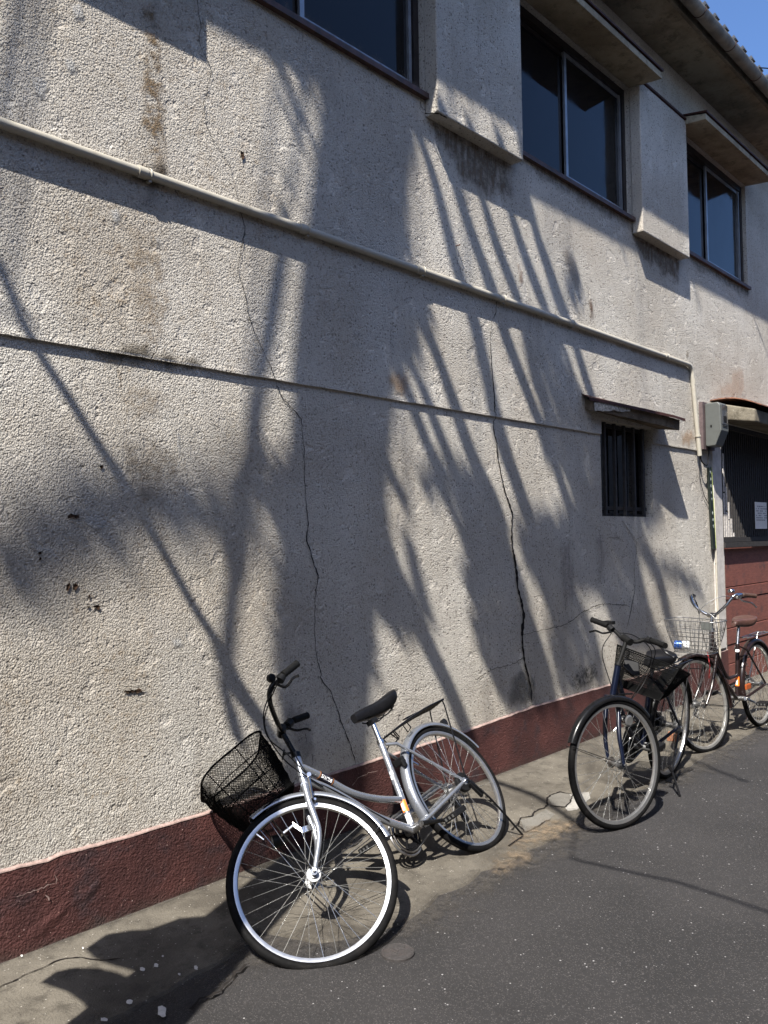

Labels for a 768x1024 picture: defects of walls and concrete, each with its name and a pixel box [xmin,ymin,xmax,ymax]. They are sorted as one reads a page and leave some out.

rust [143,35,161,157]
crack [197,0,356,764]
crack [476,304,637,700]